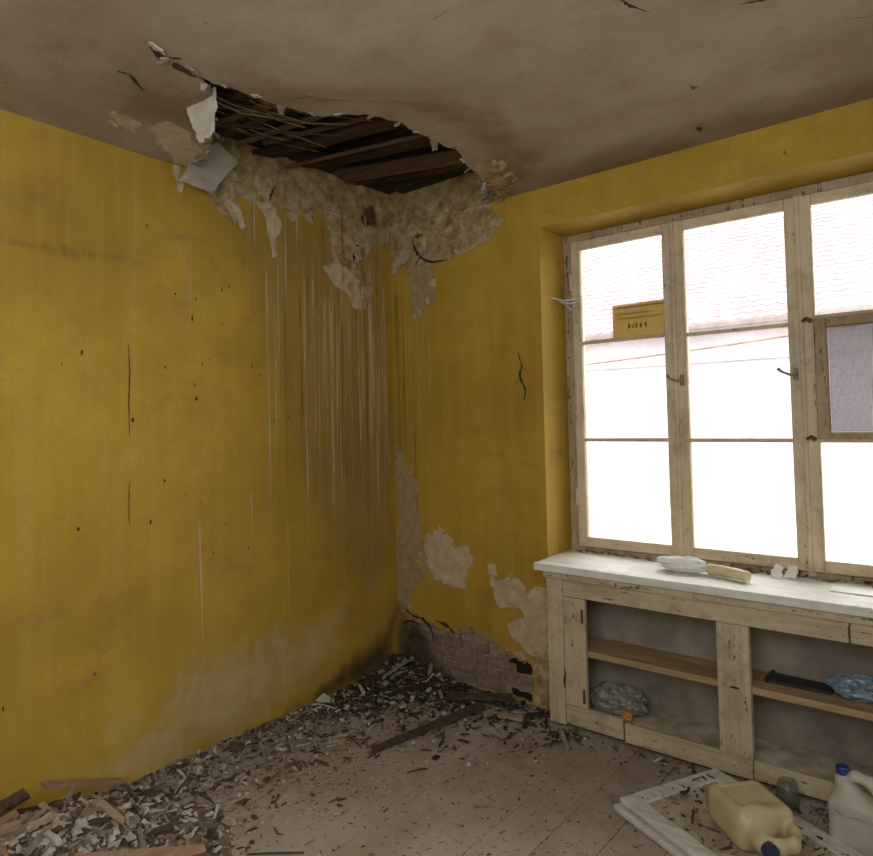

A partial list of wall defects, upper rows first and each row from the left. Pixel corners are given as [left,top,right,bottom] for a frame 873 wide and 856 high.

crack [621,0,650,12]
flaking render [108,111,519,320]
damp [266,197,297,491]
damp [303,278,389,493]
crack [516,353,526,399]
spalling [395,439,550,708]